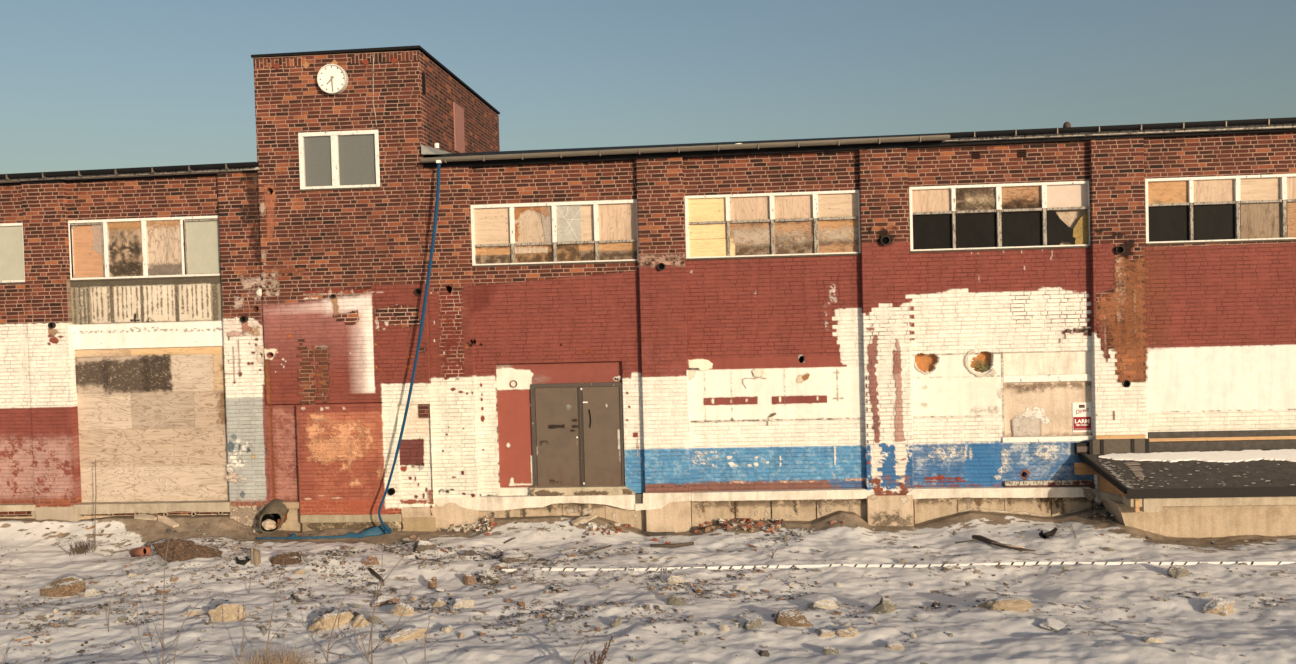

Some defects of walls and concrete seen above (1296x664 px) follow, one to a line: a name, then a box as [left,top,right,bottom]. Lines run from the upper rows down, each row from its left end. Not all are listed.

peeling [303,289,445,355]
peeling [1096,318,1109,362]
peeling [867,324,932,443]
peeling [225,333,373,500]
peeling [833,446,909,504]
peeling [925,445,972,483]
peeling [1034,445,1059,461]